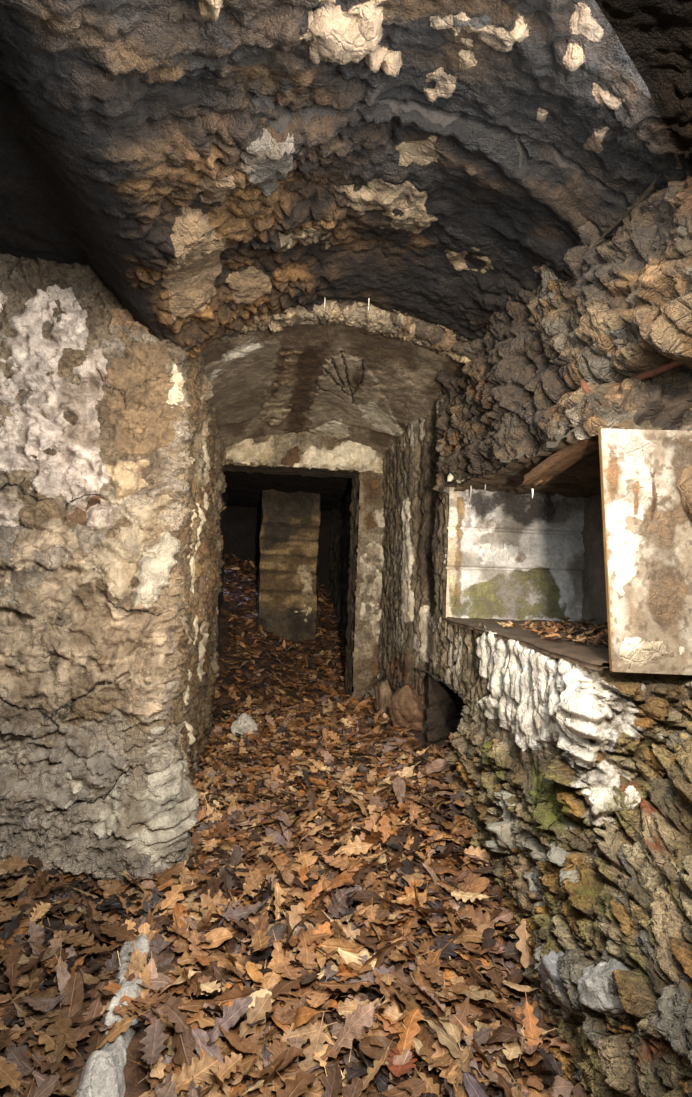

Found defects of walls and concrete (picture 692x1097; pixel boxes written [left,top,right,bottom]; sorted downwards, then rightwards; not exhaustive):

leakage [270,342,348,437]
leakage [357,402,403,437]
peeling [0,284,199,867]
crack [104,593,170,616]
crack [0,673,127,735]
crack [52,767,130,811]
leakage [476,630,685,911]
leakage [533,944,573,1018]